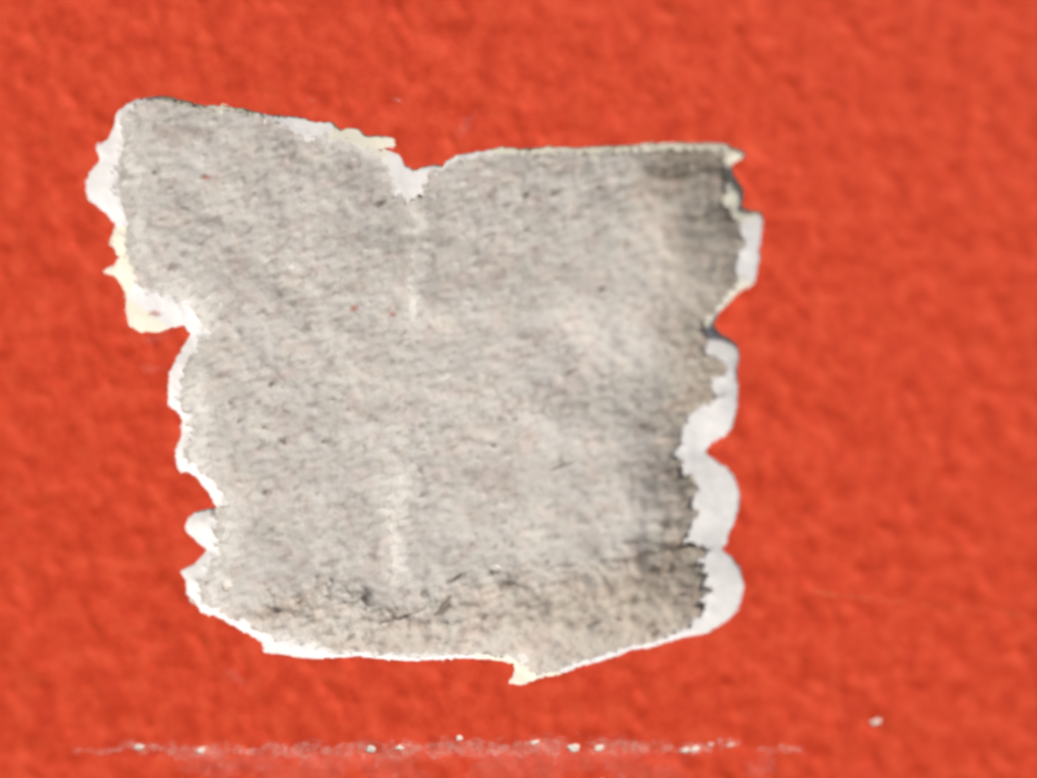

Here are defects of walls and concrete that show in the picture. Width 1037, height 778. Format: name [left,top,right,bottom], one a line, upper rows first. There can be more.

peeling [85,96,763,685]